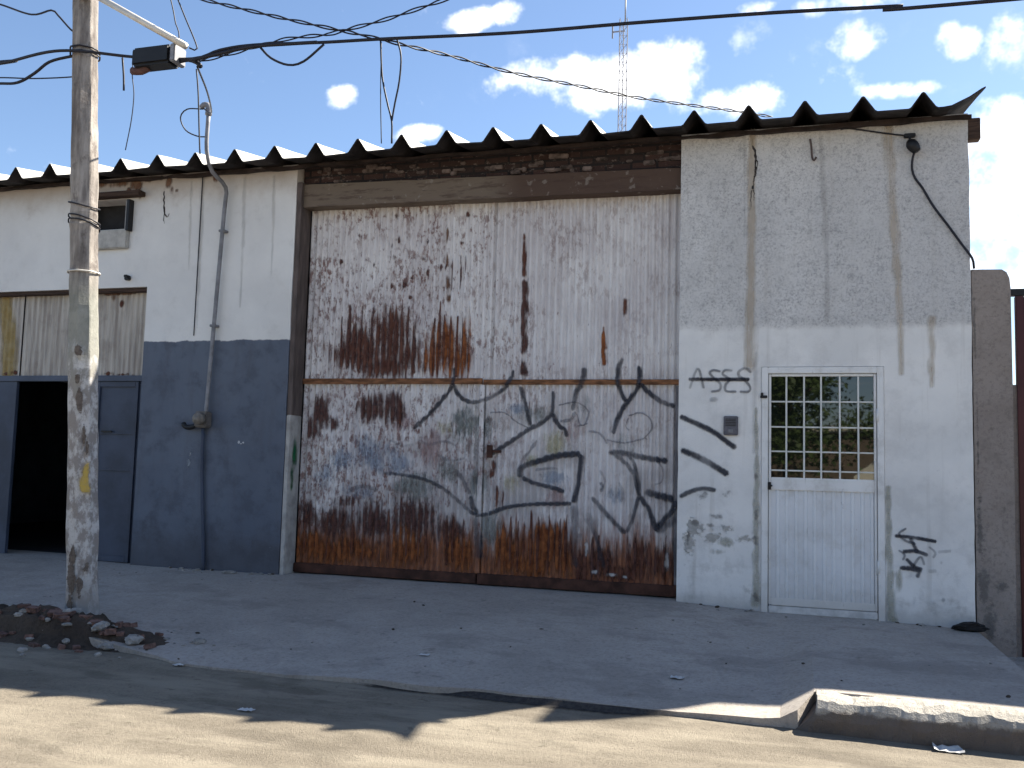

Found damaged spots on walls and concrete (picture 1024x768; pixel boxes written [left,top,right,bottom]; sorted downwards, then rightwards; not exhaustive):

crack [750,135,758,209]
rust [323,228,471,386]
rust [520,234,529,376]
rust [307,396,339,439]
rust [356,391,405,427]
rust [296,495,475,573]
rust [488,510,672,583]
peeling [683,517,750,553]